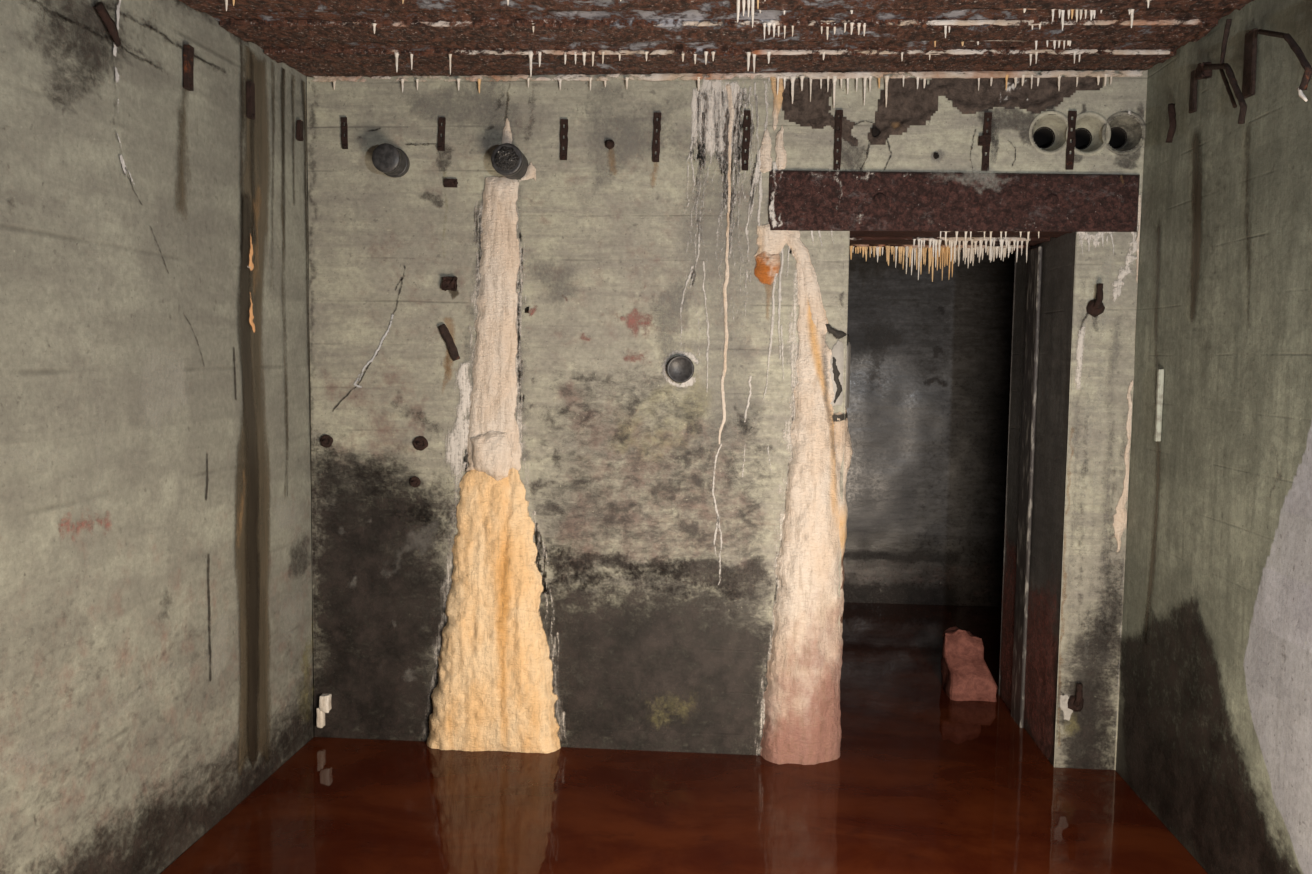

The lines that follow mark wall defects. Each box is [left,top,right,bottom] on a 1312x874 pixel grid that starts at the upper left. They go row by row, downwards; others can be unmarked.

water stain [735,0,794,40]
water stain [809,20,866,40]
water stain [888,20,1048,38]
water stain [1064,0,1200,26]
crack [31,0,220,273]
spalling [782,76,1103,146]
water stain [52,46,457,874]
crack [333,267,406,411]
water stain [312,49,1170,755]
water stain [1056,441,1289,874]